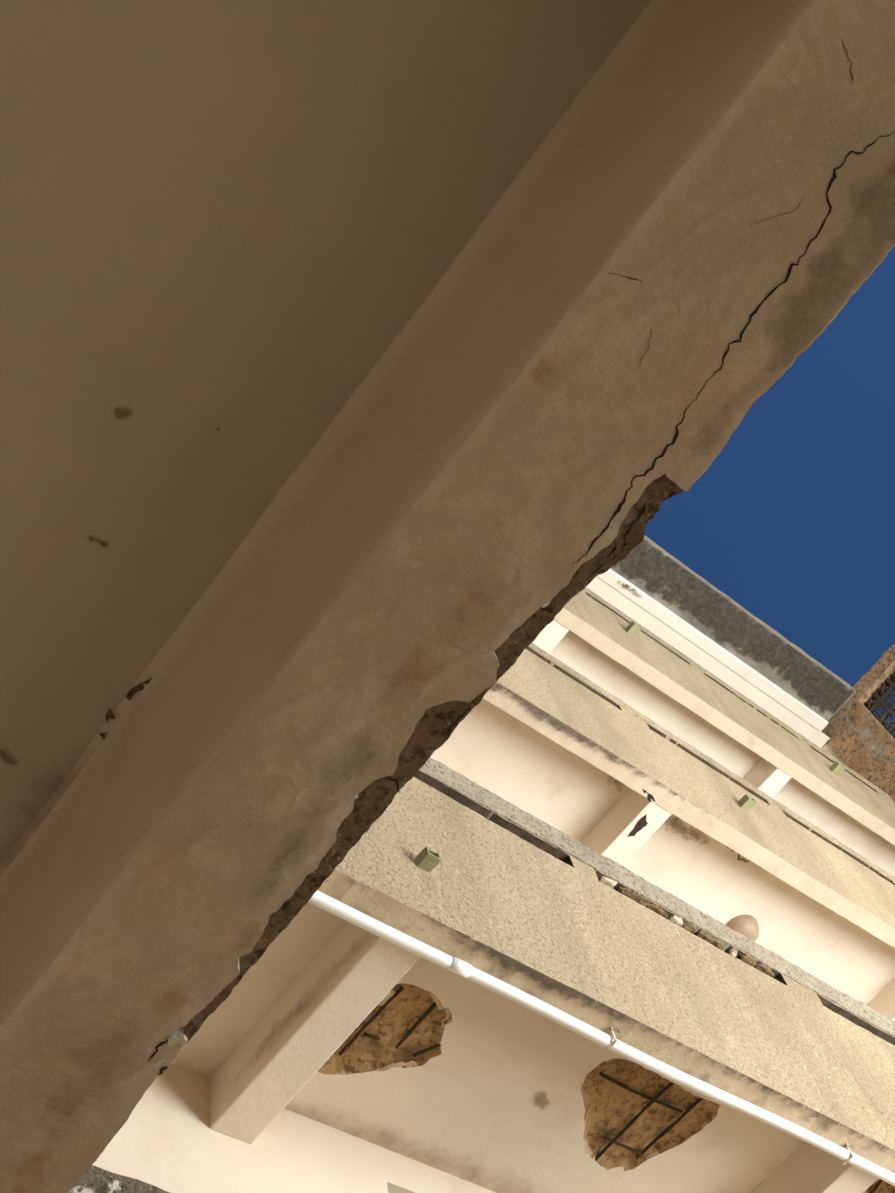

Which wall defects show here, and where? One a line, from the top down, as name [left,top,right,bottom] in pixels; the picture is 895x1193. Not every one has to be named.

crack [842,40,853,83]
leakage [785,167,895,357]
crack [572,132,894,569]
leakage [613,539,854,713]
spalling [155,474,683,1075]
spalling [581,1058,721,1171]
spalling [866,1179,895,1193]